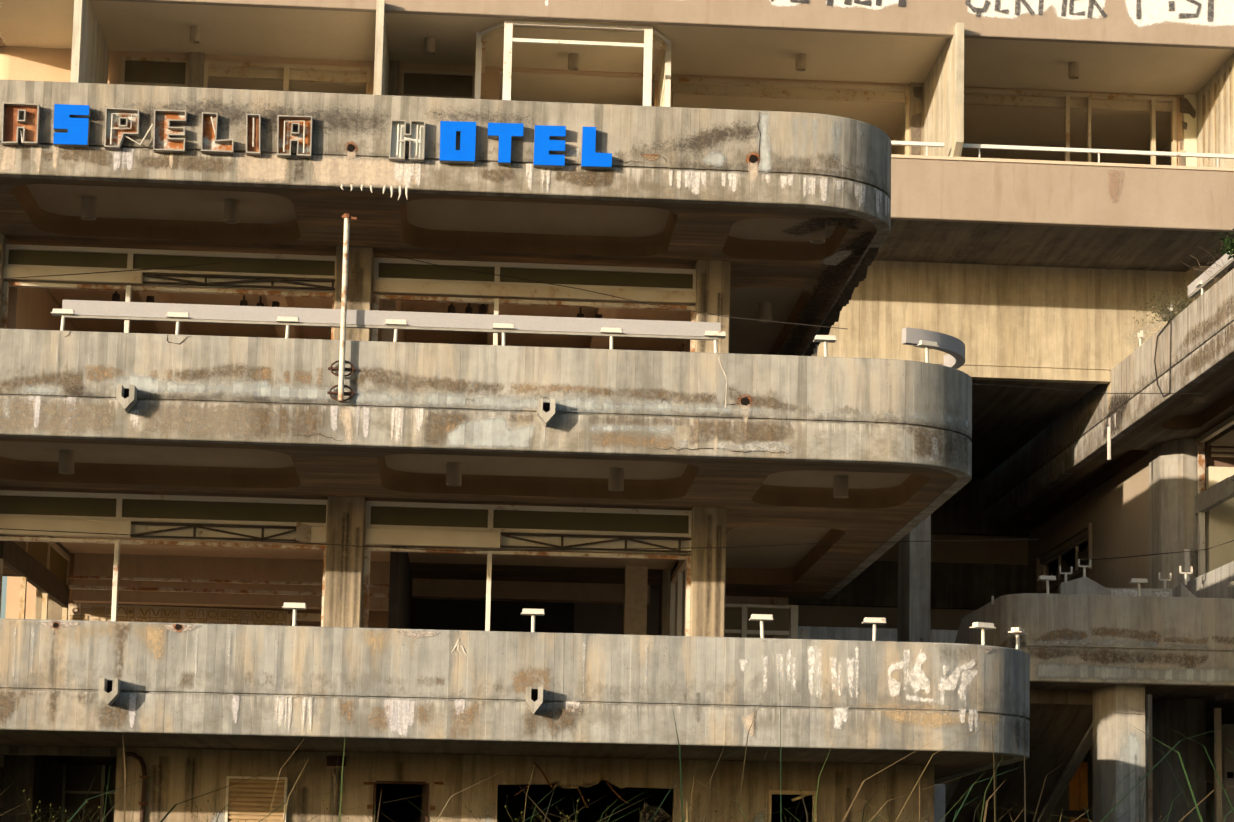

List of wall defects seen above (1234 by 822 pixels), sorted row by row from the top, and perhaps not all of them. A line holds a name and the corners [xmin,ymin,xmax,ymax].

water stain [1,145,421,188]
water stain [482,164,613,192]
water stain [1183,297,1234,375]
water stain [0,366,790,452]
water stain [999,628,1234,683]
water stain [100,693,137,728]
efflorescence [276,697,312,730]
water stain [370,699,427,735]
water stain [452,700,478,736]
water stain [526,702,581,734]
water stain [763,646,859,729]
water stain [888,678,977,728]